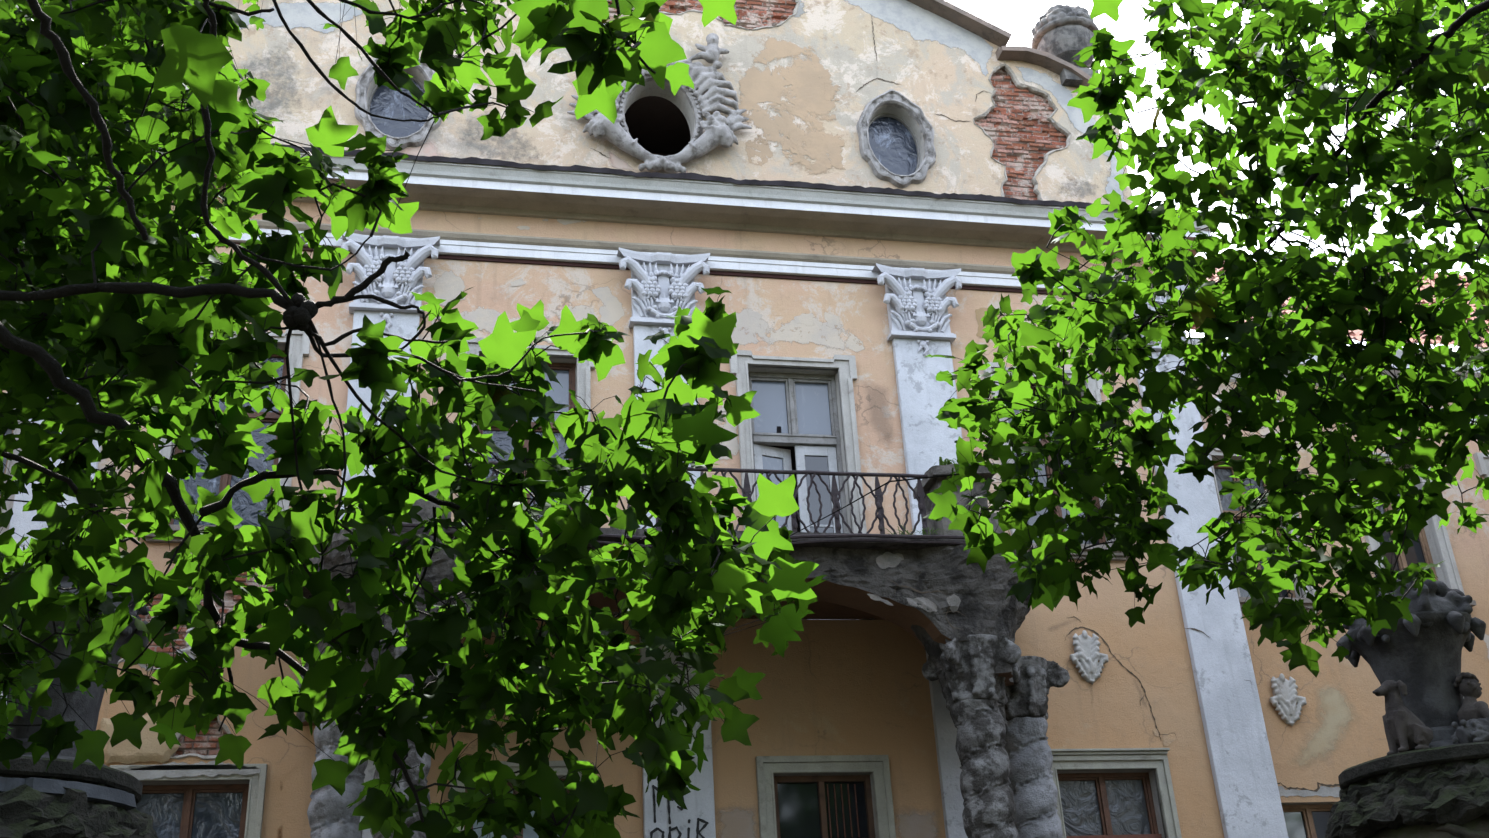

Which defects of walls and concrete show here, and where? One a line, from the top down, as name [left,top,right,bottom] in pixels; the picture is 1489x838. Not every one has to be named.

peeling [659,0,846,175]
spalling [844,0,1125,202]
crack [1065,616,1176,739]